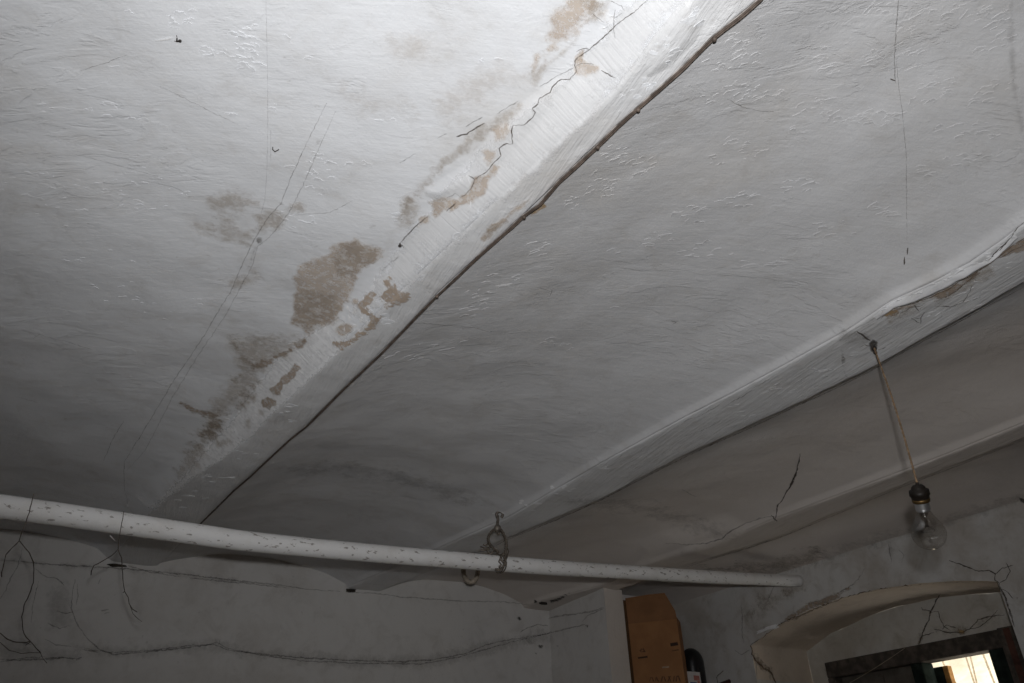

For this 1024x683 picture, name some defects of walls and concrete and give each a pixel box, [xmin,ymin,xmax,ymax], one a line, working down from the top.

crack [401,2,645,248]
damp [294,242,377,324]
flaking render [333,276,410,350]
flaking render [873,235,1024,320]
damp [261,364,299,408]
crack [501,222,1024,543]
crack [750,560,1014,683]